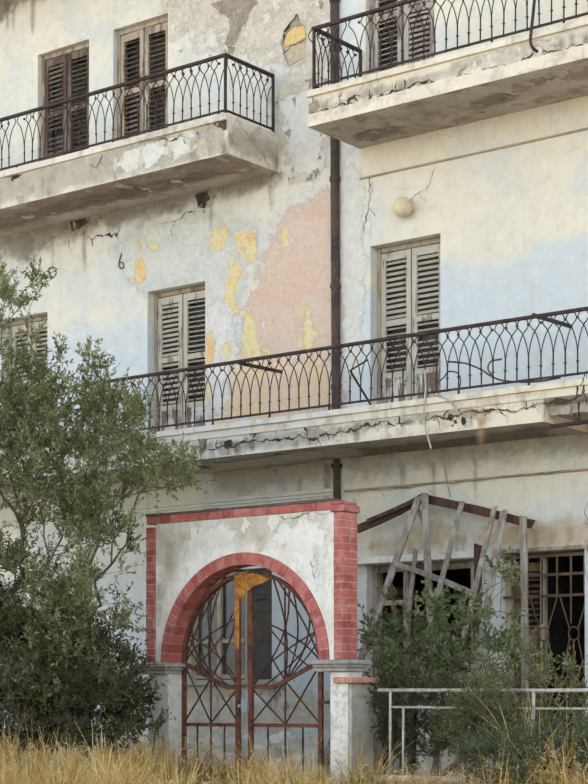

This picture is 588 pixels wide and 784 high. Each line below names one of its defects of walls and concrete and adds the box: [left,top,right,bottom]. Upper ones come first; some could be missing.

crack [311,79,436,114]
crack [456,41,588,77]
crack [88,228,120,246]
peeling [0,130,260,232]
peeling [108,0,372,425]
crack [200,371,587,461]
peeling [267,514,328,611]
rust [234,573,270,649]